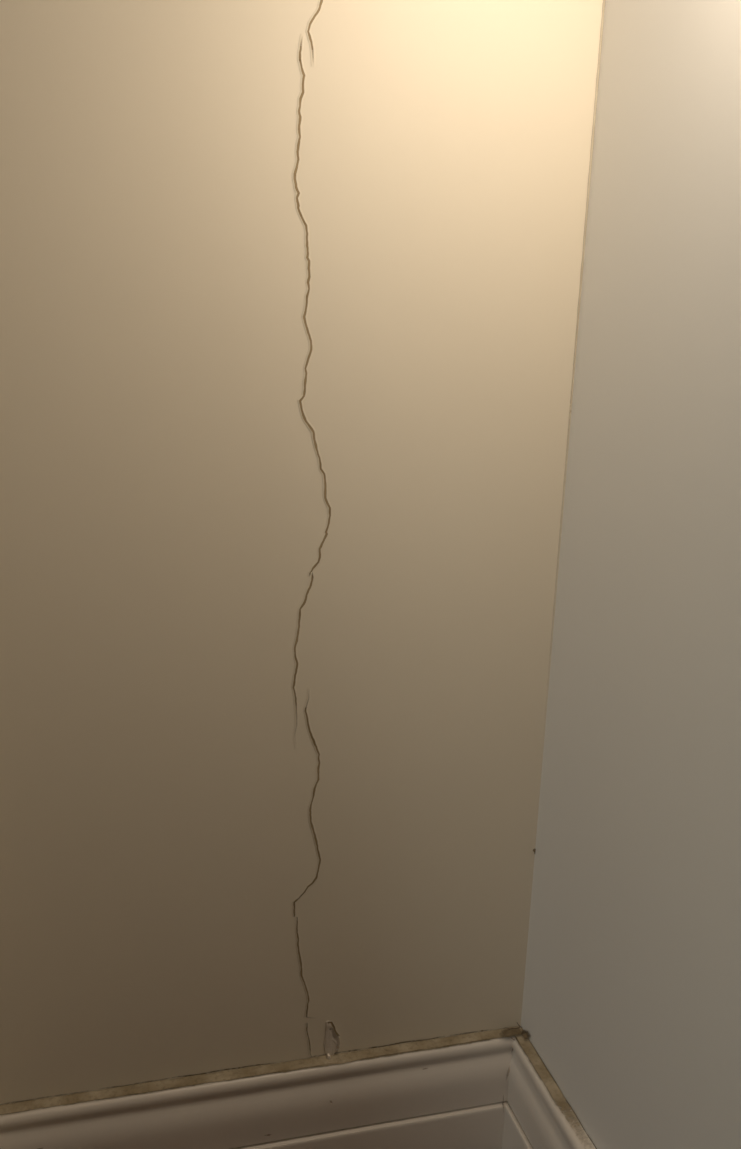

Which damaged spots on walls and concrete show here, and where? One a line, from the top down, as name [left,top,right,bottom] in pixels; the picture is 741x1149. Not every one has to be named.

crack [291,0,333,1058]